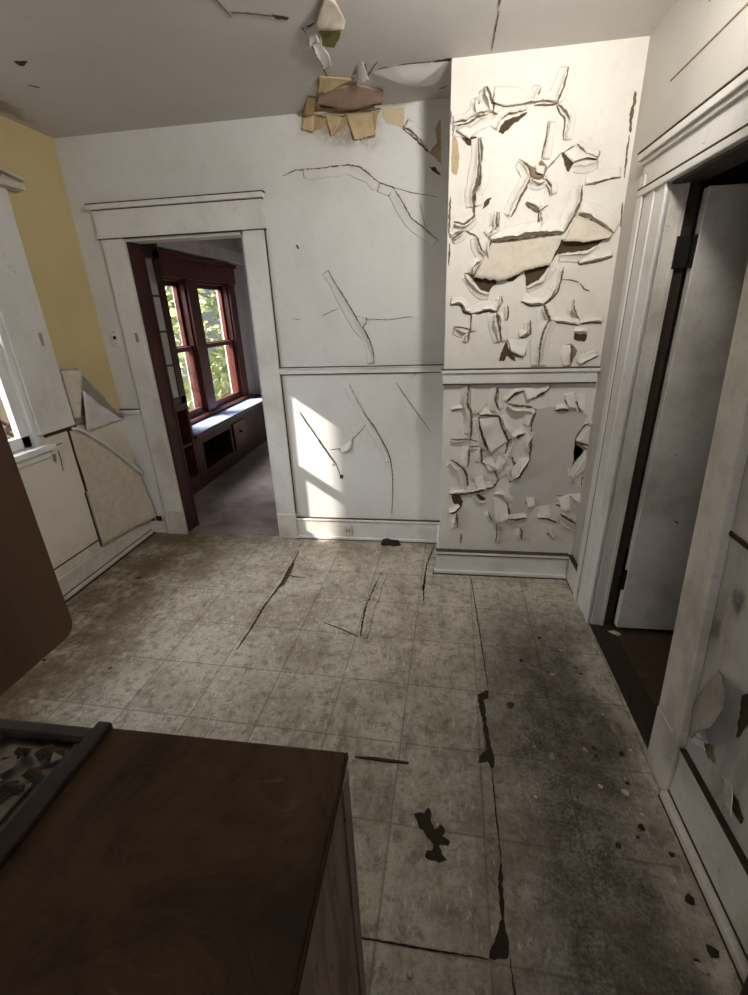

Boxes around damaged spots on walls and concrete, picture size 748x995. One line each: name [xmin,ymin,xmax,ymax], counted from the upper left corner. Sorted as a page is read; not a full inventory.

peeling [307,0,346,49]
crack [283,164,451,265]
peeling [301,61,621,367]
crack [296,270,413,364]
crack [344,384,393,513]
peeling [447,384,594,543]
peeling [690,671,725,763]
peeling [736,693,748,738]
peeling [721,776,744,824]